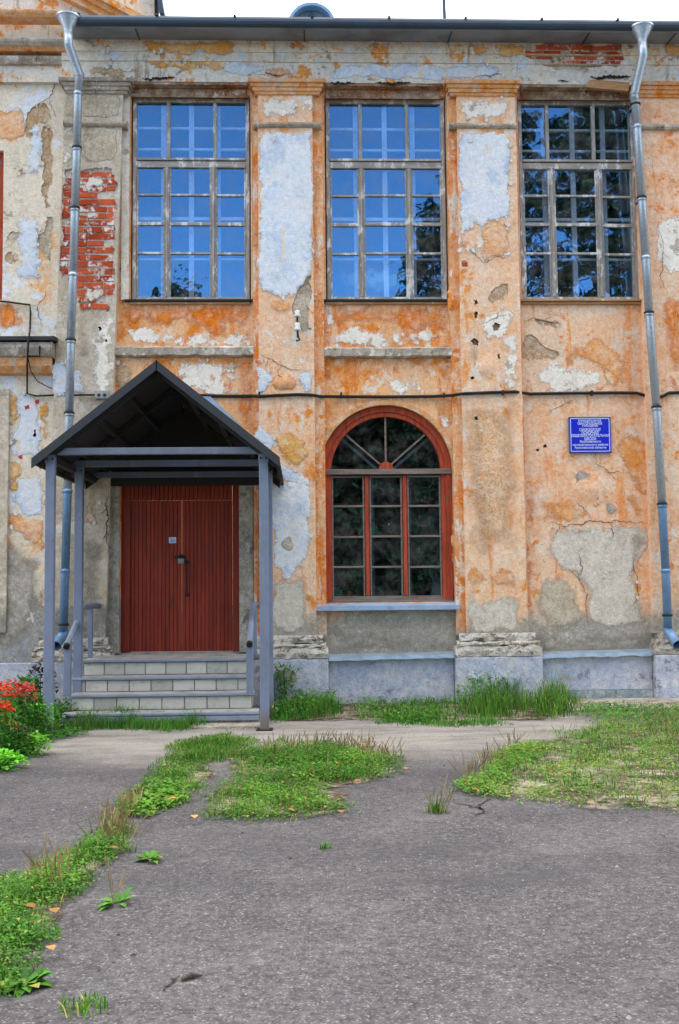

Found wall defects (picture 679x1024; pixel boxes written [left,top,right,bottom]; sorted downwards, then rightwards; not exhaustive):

flaking render [332,43,624,82]
peeling [457,96,513,266]
flaking render [5,103,133,397]
peeling [254,132,314,332]
peeling [656,216,679,274]
peeling [482,283,603,392]
peeling [9,391,42,459]
peeling [254,425,275,450]
peeling [8,474,45,550]
peeling [272,463,313,580]
crack [545,502,644,539]